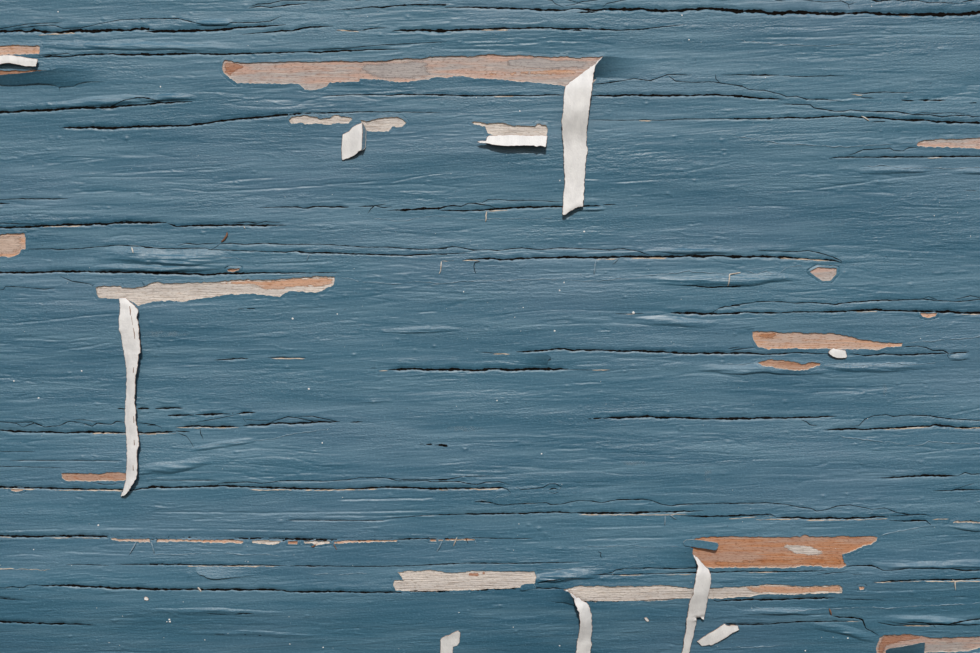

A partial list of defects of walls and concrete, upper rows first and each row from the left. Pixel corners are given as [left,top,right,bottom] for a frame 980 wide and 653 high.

peeling [0,41,110,87]
crack [0,86,560,130]
peeling [218,49,662,215]
crack [0,0,980,57]
crack [592,74,980,124]
crack [0,198,842,290]
peeling [59,266,338,497]
peeling [749,328,906,373]
crack [0,407,980,541]
crack [39,562,566,636]
peeling [390,531,880,653]
peeling [873,631,980,653]